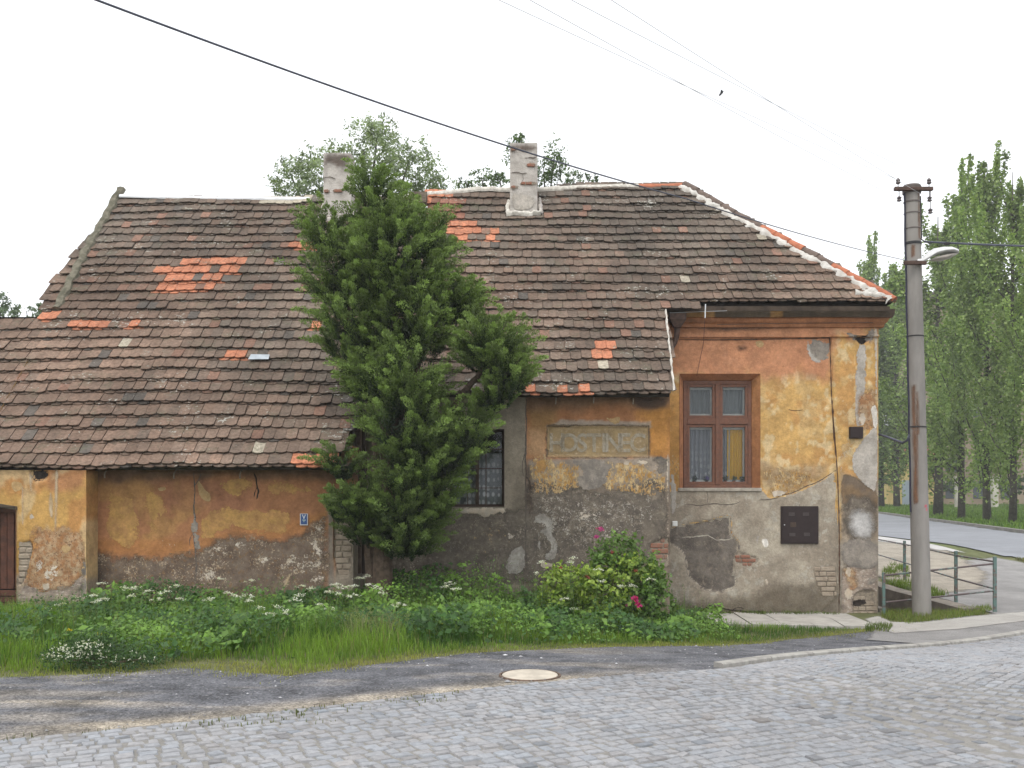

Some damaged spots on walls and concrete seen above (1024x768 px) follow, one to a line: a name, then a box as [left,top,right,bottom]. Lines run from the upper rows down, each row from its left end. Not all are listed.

flaking render [807,339,830,363]
peeling [847,328,878,429]
peeling [17,514,86,607]
peeling [105,487,168,549]
crack [189,475,201,581]
peeling [181,477,312,582]
spalling [259,517,353,583]
peeling [530,454,679,568]
flaking render [650,517,758,593]
crack [672,337,840,603]
flaking render [813,566,878,613]
leakage [841,474,878,540]